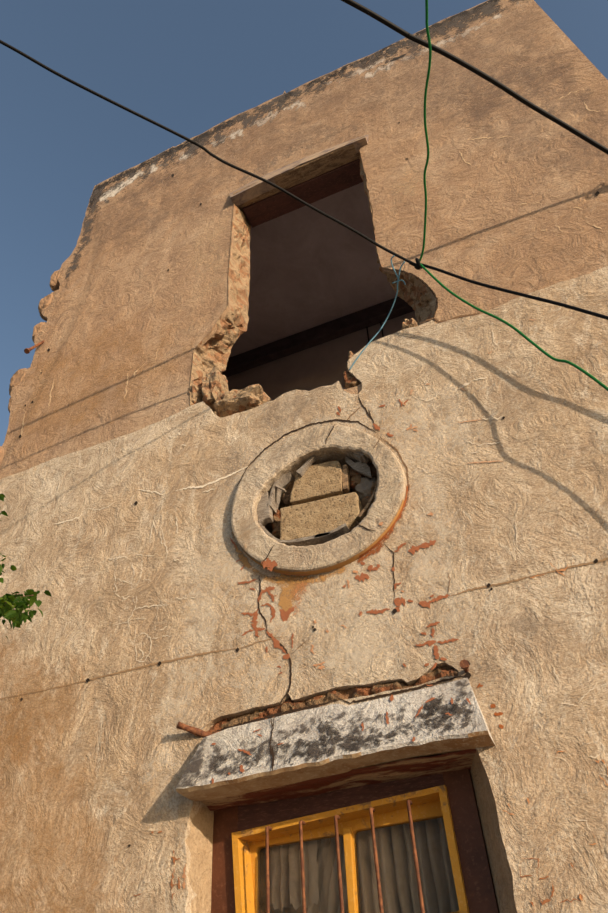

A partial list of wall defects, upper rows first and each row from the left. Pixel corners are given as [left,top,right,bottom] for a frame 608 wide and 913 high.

water stain [65,0,519,286]
spalling [359,149,436,330]
spalling [187,204,271,418]
crack [238,396,429,513]
spalling [343,351,360,389]
peeling [316,389,480,464]
crack [0,520,464,771]
spalling [239,594,331,641]
corrosion [231,484,409,615]
peeling [329,474,456,594]
spalling [352,583,451,629]
mould [176,680,476,788]